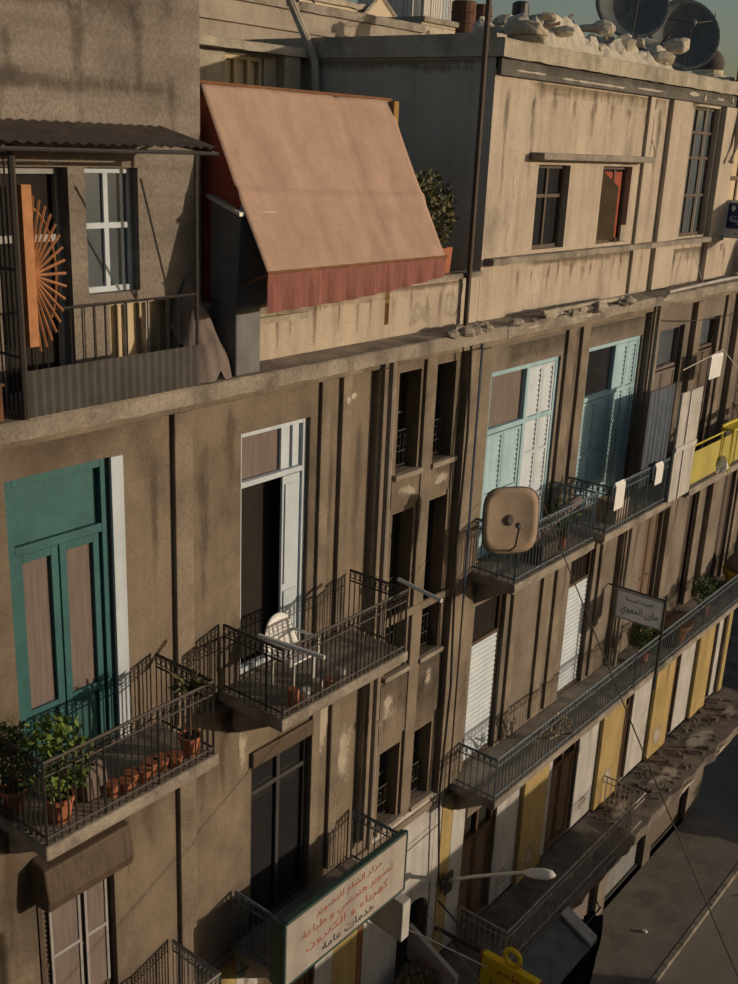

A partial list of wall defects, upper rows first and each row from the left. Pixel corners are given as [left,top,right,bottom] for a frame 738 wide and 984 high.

flaking render [319,707,328,754]
flaking render [337,723,352,778]